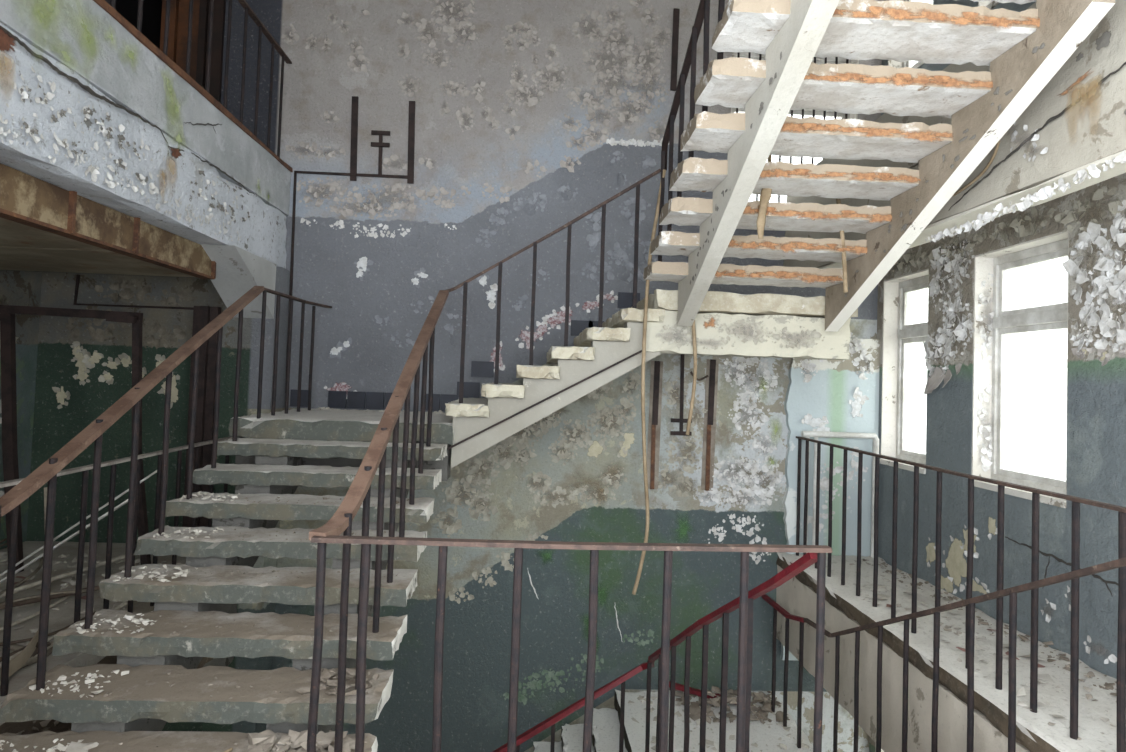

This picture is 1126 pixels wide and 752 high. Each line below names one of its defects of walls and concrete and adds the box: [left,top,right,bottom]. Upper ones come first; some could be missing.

rust [833,6,1040,28]
rust [804,72,993,88]
rust [781,122,952,142]
crack [949,62,1126,210]
peeling [296,0,672,372]
rust [743,205,892,222]
rust [759,169,921,183]
peeling [886,151,1126,394]
peeling [52,341,165,409]
peeling [655,319,830,564]
peeling [926,517,997,594]
crack [1005,537,1118,597]